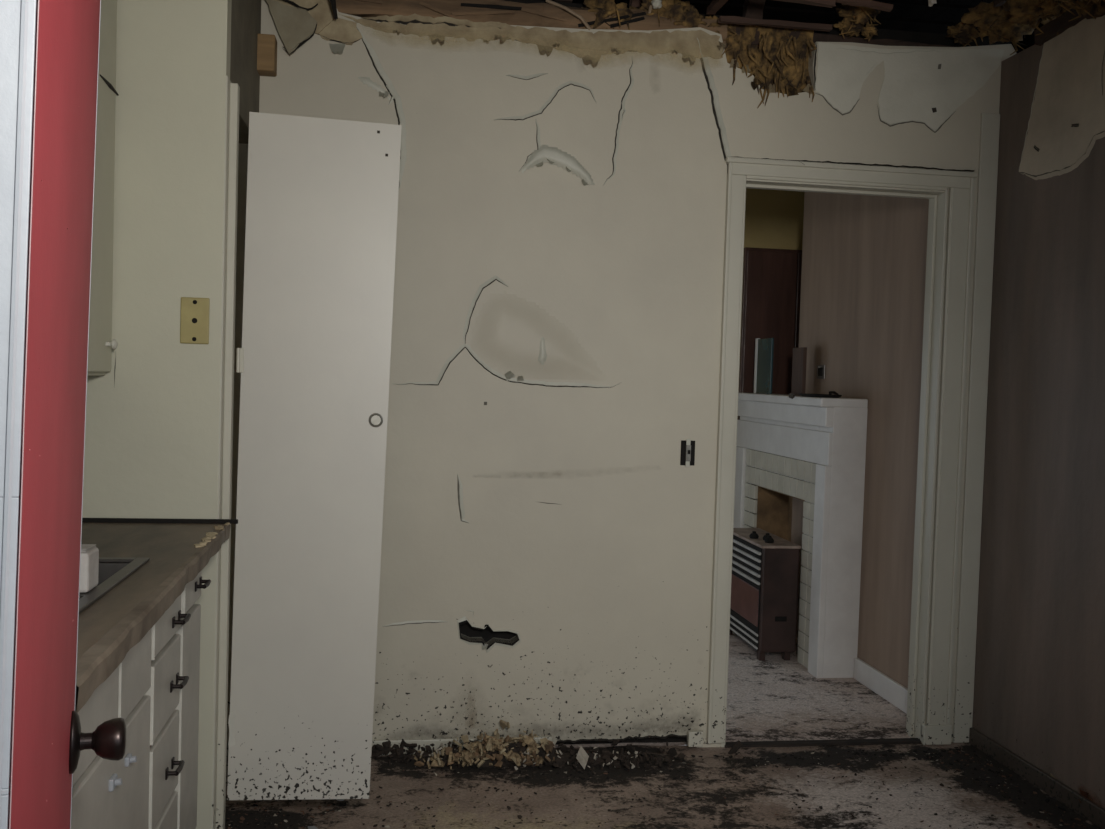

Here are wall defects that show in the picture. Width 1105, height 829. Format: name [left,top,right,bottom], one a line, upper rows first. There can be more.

crack [495,58,634,184]
flaking render [265,0,1004,133]
crack [697,38,975,172]
crack [397,275,622,388]
hole [457,616,521,653]